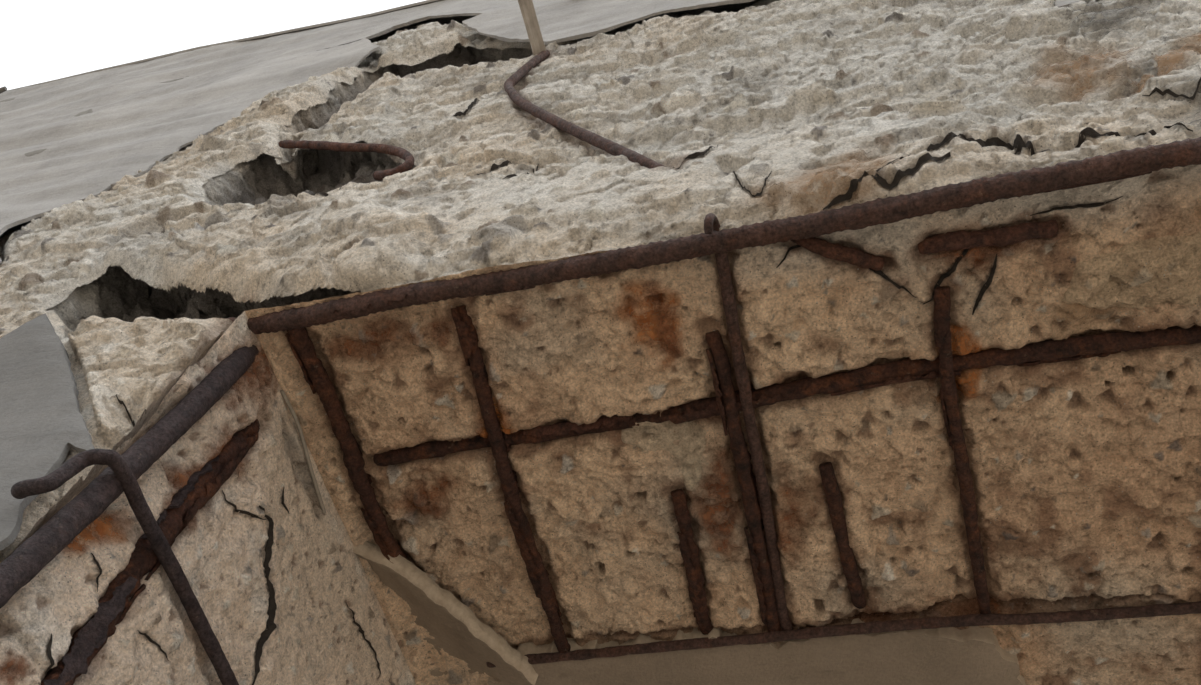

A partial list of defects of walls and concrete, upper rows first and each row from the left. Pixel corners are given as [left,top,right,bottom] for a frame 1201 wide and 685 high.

spalling [0,0,1201,345]
crack [823,65,1201,210]
flaking render [0,313,108,563]
spalling [0,492,144,685]
corrosion [43,561,161,685]
corrosion [156,427,259,547]
crack [222,488,289,685]
corrosion [504,502,564,626]
corrosion [480,402,632,452]
spalling [46,254,1201,685]
corrosion [831,288,987,450]
spalling [727,164,1201,389]